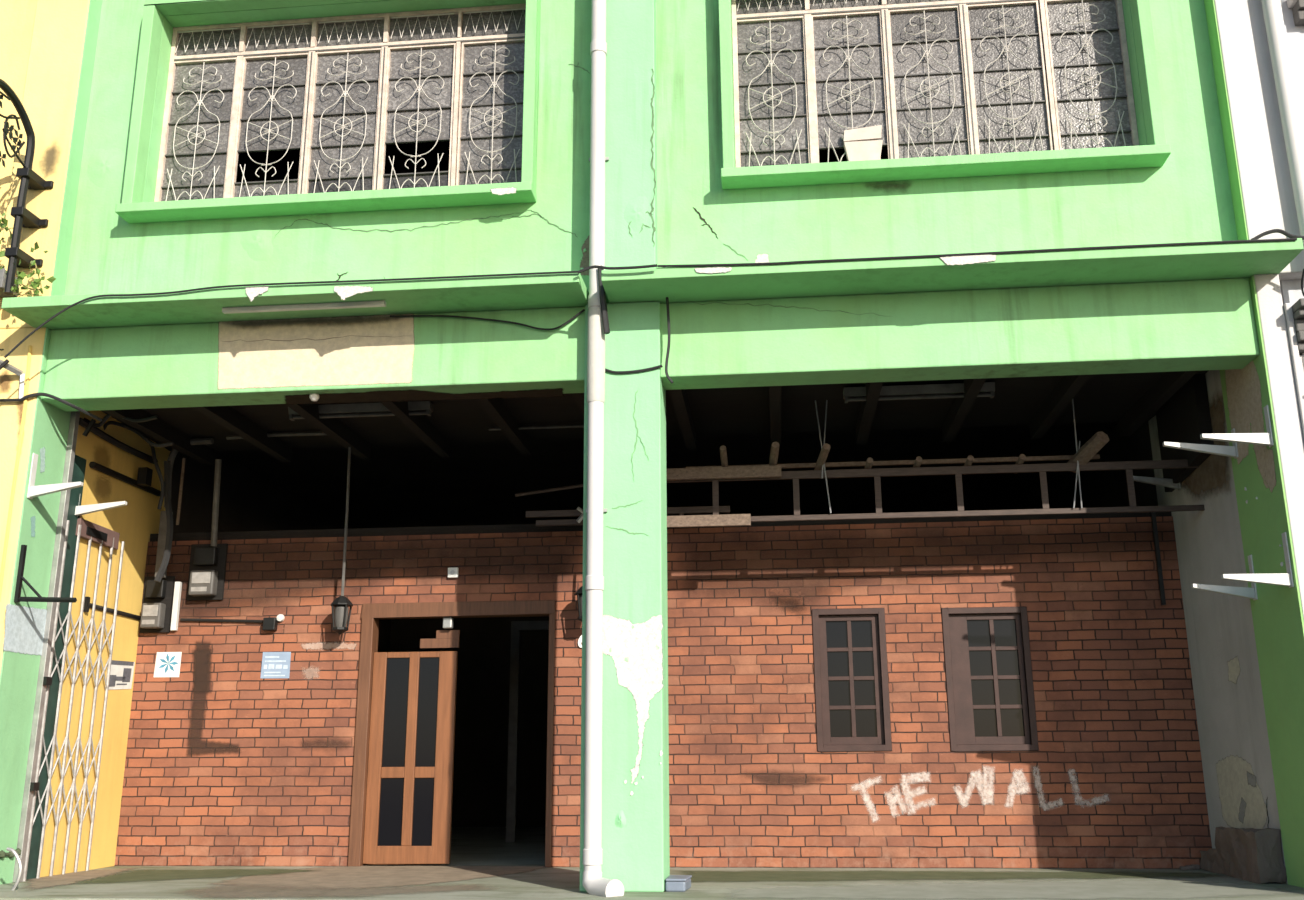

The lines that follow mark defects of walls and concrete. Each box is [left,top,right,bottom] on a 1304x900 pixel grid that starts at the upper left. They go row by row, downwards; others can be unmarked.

crack [276,210,577,237]
crack [628,68,656,247]
crack [693,207,748,261]
crack [606,390,649,536]
peeling [1225,360,1276,504]
peeling [603,615,663,796]
peeling [1216,755,1267,829]